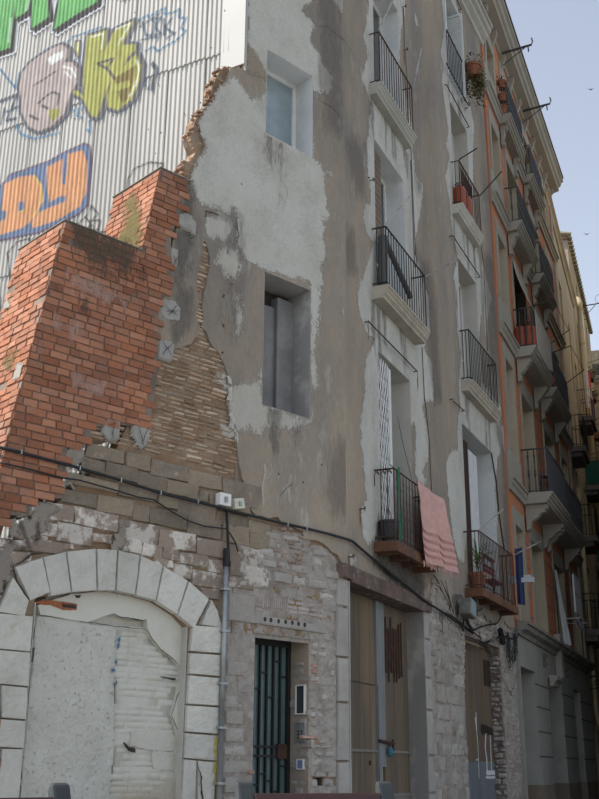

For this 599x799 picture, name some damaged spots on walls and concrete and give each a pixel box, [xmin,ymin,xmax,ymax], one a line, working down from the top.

spalling [173,66,229,182]
spalling [91,328,238,475]